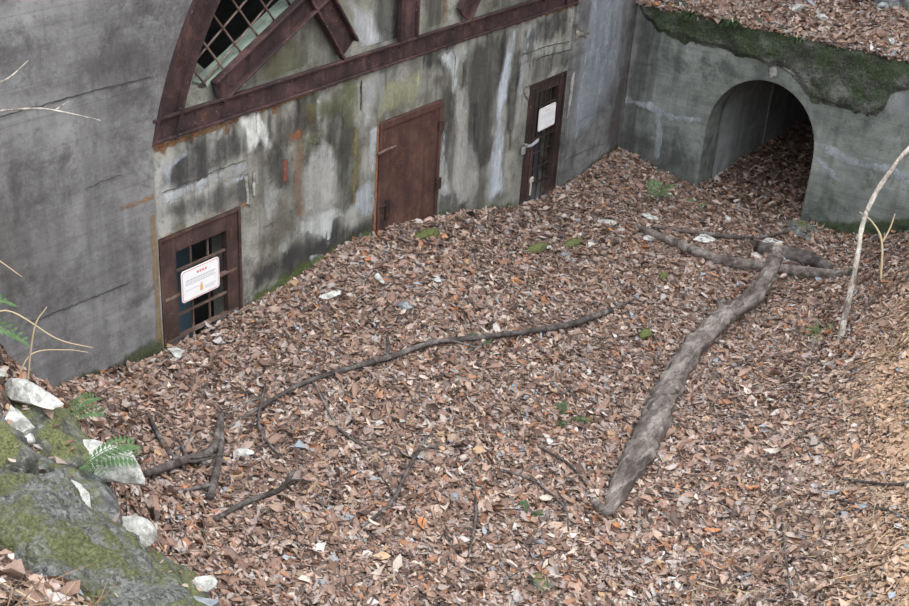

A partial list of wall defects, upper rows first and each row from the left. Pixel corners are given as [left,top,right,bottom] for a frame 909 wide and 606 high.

crack [0,75,157,117]
water stain [162,100,320,213]
rust [154,84,337,154]
water stain [255,104,373,289]
water stain [424,12,566,211]
crack [26,282,131,325]